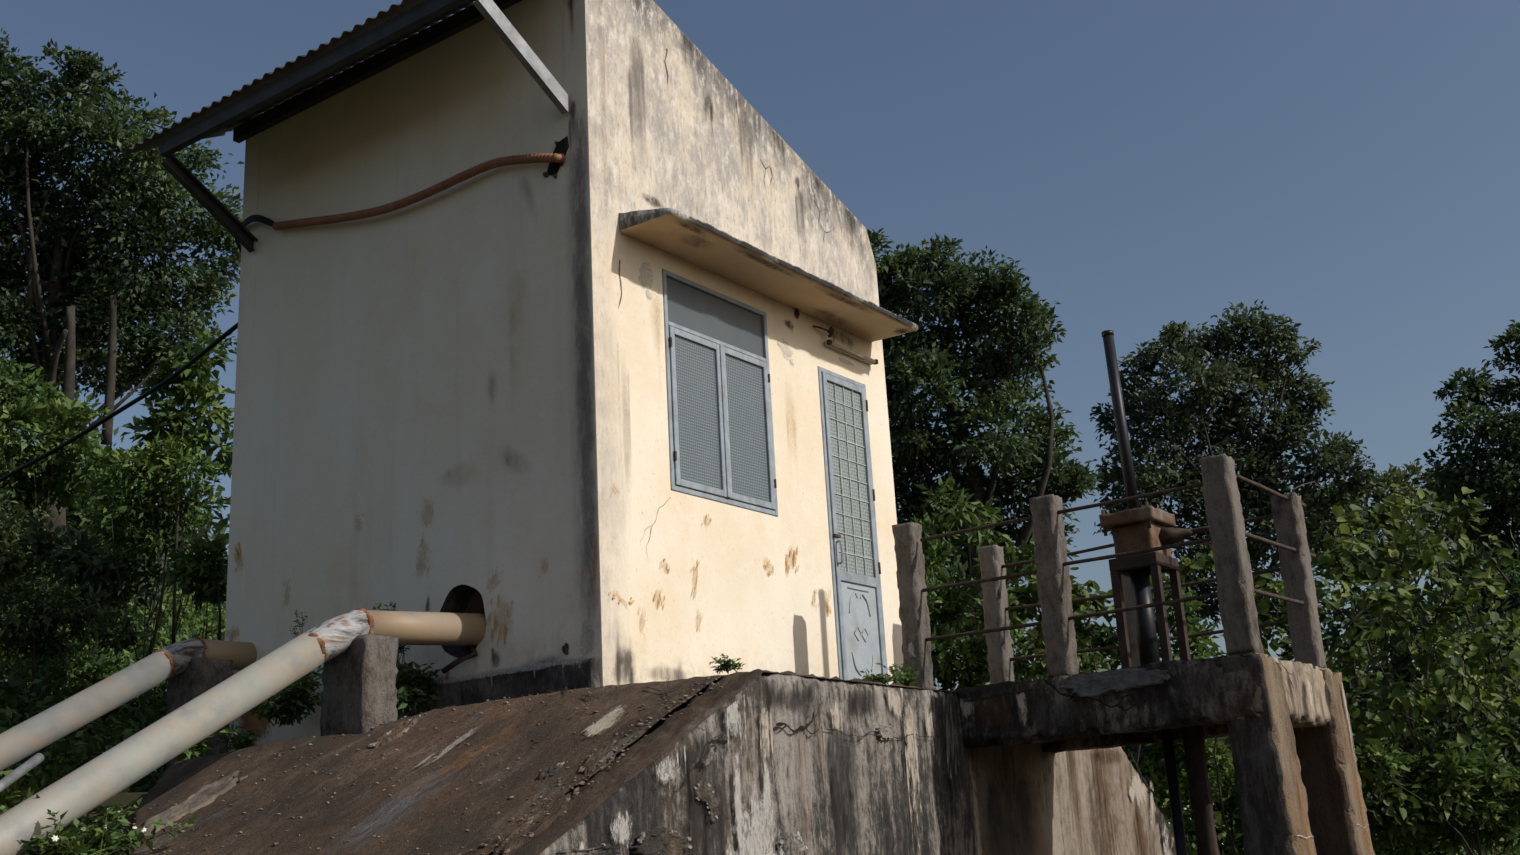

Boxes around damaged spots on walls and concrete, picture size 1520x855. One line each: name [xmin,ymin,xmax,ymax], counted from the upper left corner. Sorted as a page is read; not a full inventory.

water stain [682,217,914,343]
water stain [573,161,595,591]
water stain [617,652,633,683]
water stain [584,706,626,737]
water stain [1293,672,1355,750]
spalling [493,740,618,855]
efflorescence [611,811,631,847]
spalling [556,826,692,855]
spalling [691,743,720,824]
water stain [656,681,815,855]
water stain [830,686,1029,855]
water stain [1129,774,1170,855]